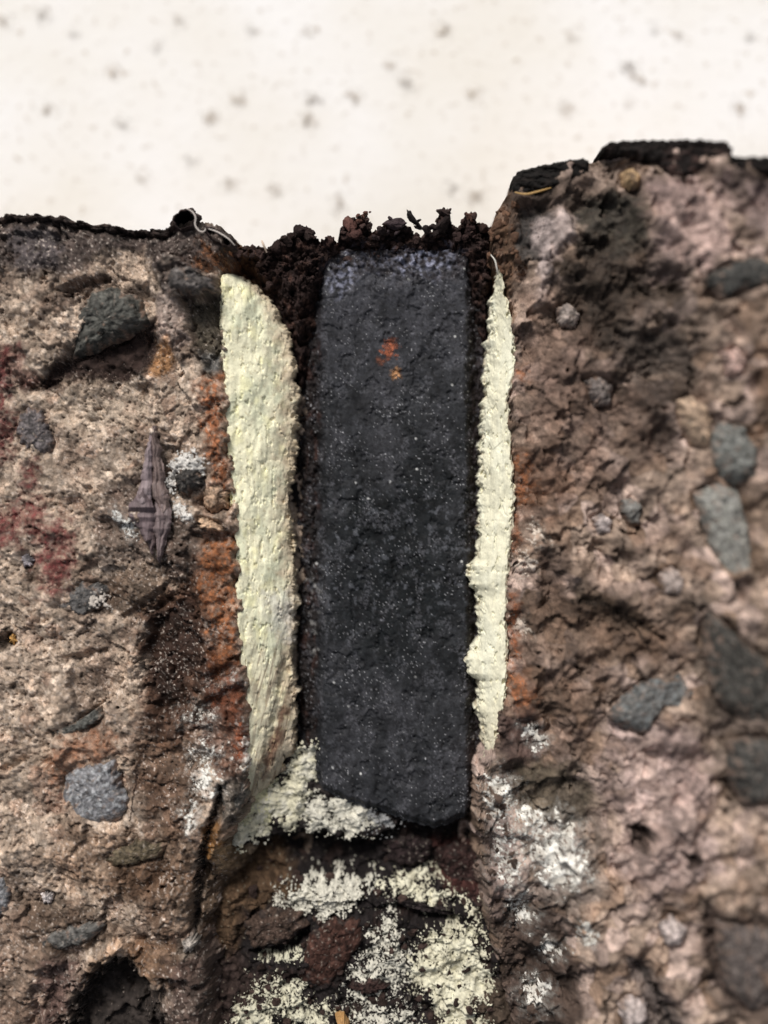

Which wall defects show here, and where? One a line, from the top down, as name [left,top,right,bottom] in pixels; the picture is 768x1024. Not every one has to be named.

corrosion [194,207,493,389]
corrosion [200,374,230,499]
corrosion [197,538,245,758]
efflorescence [515,719,549,754]
crack [193,787,223,928]
efflorescence [476,766,600,1016]